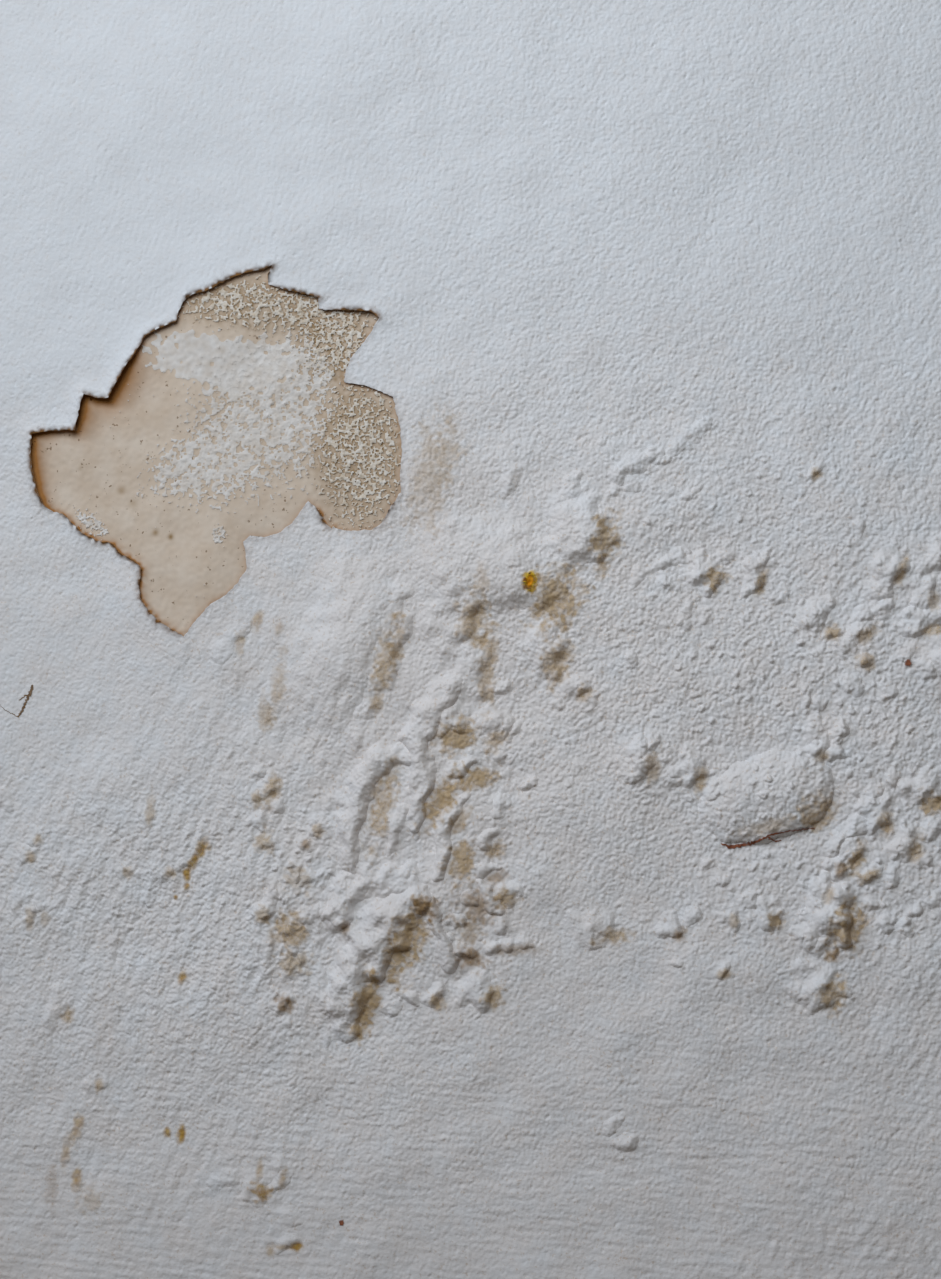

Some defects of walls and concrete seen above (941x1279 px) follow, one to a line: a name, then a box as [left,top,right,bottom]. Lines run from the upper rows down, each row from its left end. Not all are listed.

peeling [11,243,425,660]
water stain [591,517,619,564]
water stain [523,569,580,628]
water stain [442,717,474,748]
water stain [423,770,492,828]
water stain [922,797,941,814]
water stain [838,851,874,874]
water stain [833,904,864,947]
water stain [351,900,432,1039]